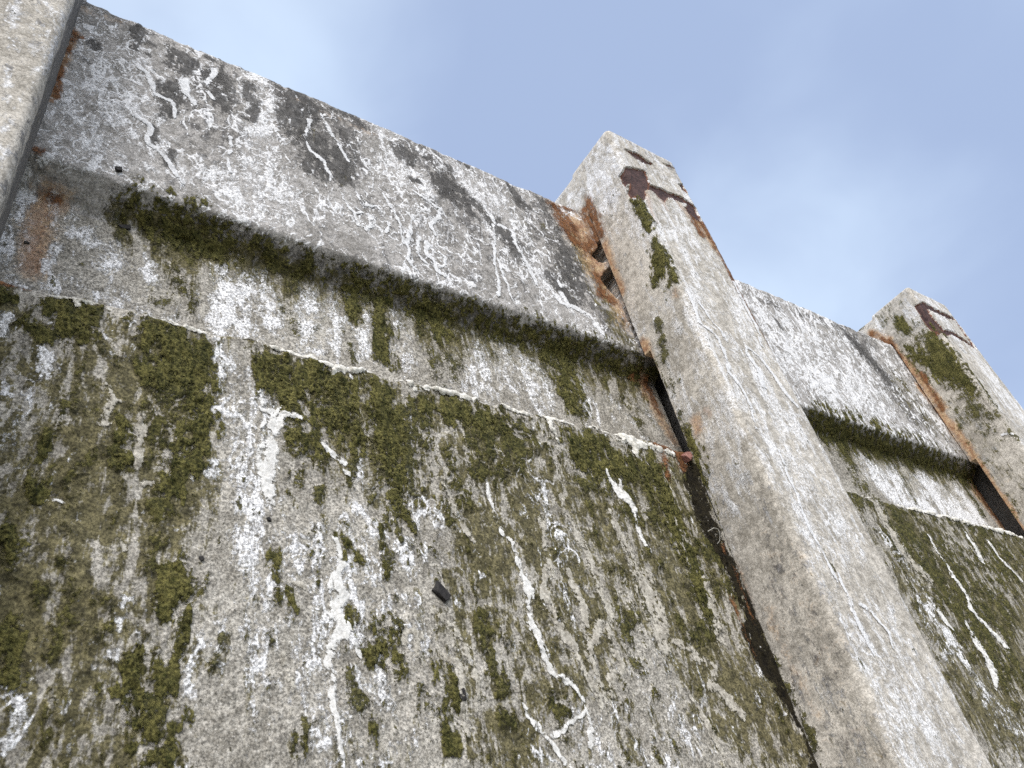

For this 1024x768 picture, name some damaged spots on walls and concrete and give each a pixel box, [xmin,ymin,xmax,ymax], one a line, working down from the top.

damp [127,23,367,191]
rust [547,196,605,253]
damp [50,295,111,310]
rust [592,271,618,305]
damp [238,337,370,375]
rust [919,371,945,413]
damp [255,389,303,505]
damp [321,441,351,476]
damp [388,379,819,768]
damp [928,535,1010,691]
damp [323,536,362,759]